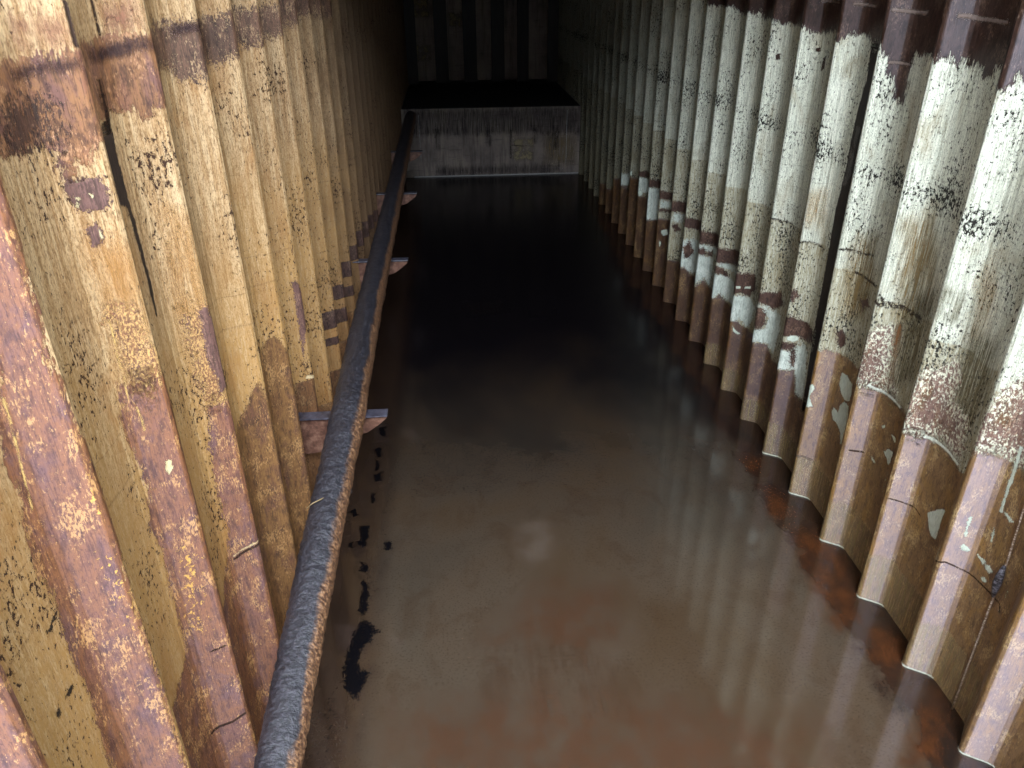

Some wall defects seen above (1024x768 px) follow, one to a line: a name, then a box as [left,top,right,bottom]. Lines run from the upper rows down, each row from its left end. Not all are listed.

rust [0,0,323,186]
peeling [605,171,1024,768]
rust [956,332,994,428]
crack [935,560,1000,612]